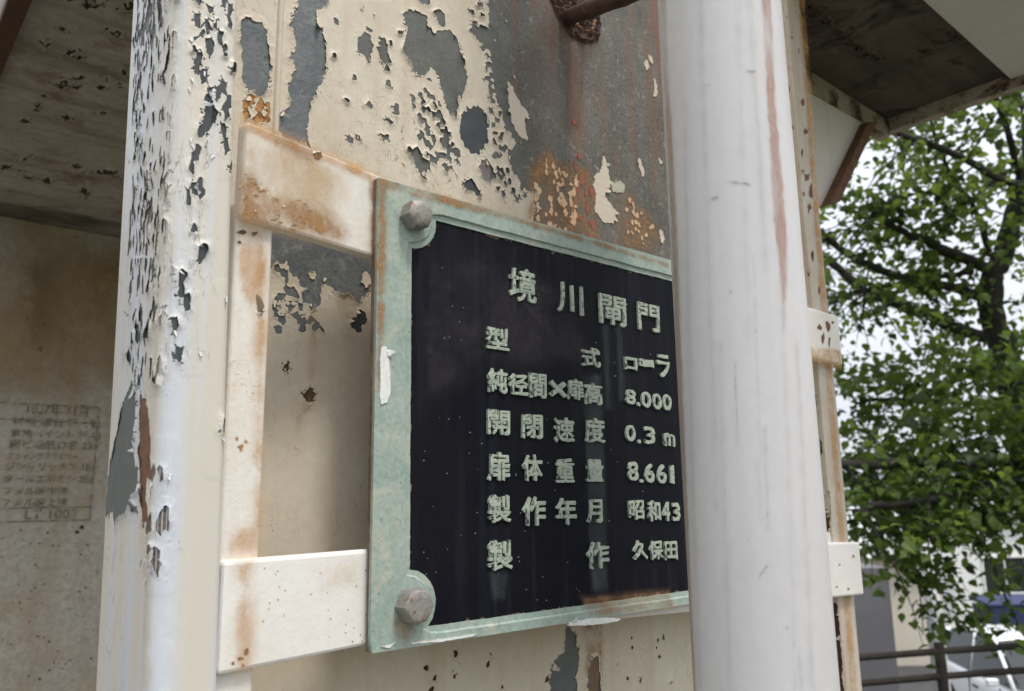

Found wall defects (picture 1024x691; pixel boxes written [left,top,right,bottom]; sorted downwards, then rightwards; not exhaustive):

corrosion [551,0,601,44]
peeling [0,0,191,585]
peeling [191,223,209,264]
corrosion [236,181,277,282]
peeling [186,0,339,206]
peeling [238,173,372,334]
corrosion [290,204,341,237]
corrosion [436,195,480,211]
peeling [357,0,671,260]
corrosion [521,153,657,256]
corrosion [767,64,786,279]
peeling [545,616,601,691]